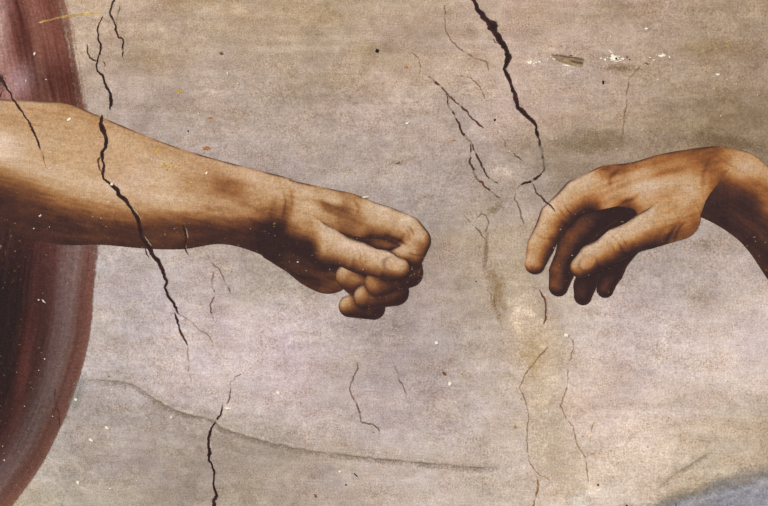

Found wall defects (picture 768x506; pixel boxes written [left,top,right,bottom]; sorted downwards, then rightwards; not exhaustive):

crack [0,76,46,168]
crack [415,0,555,224]
crack [86,0,213,378]
crack [207,374,240,506]
crack [349,362,379,431]